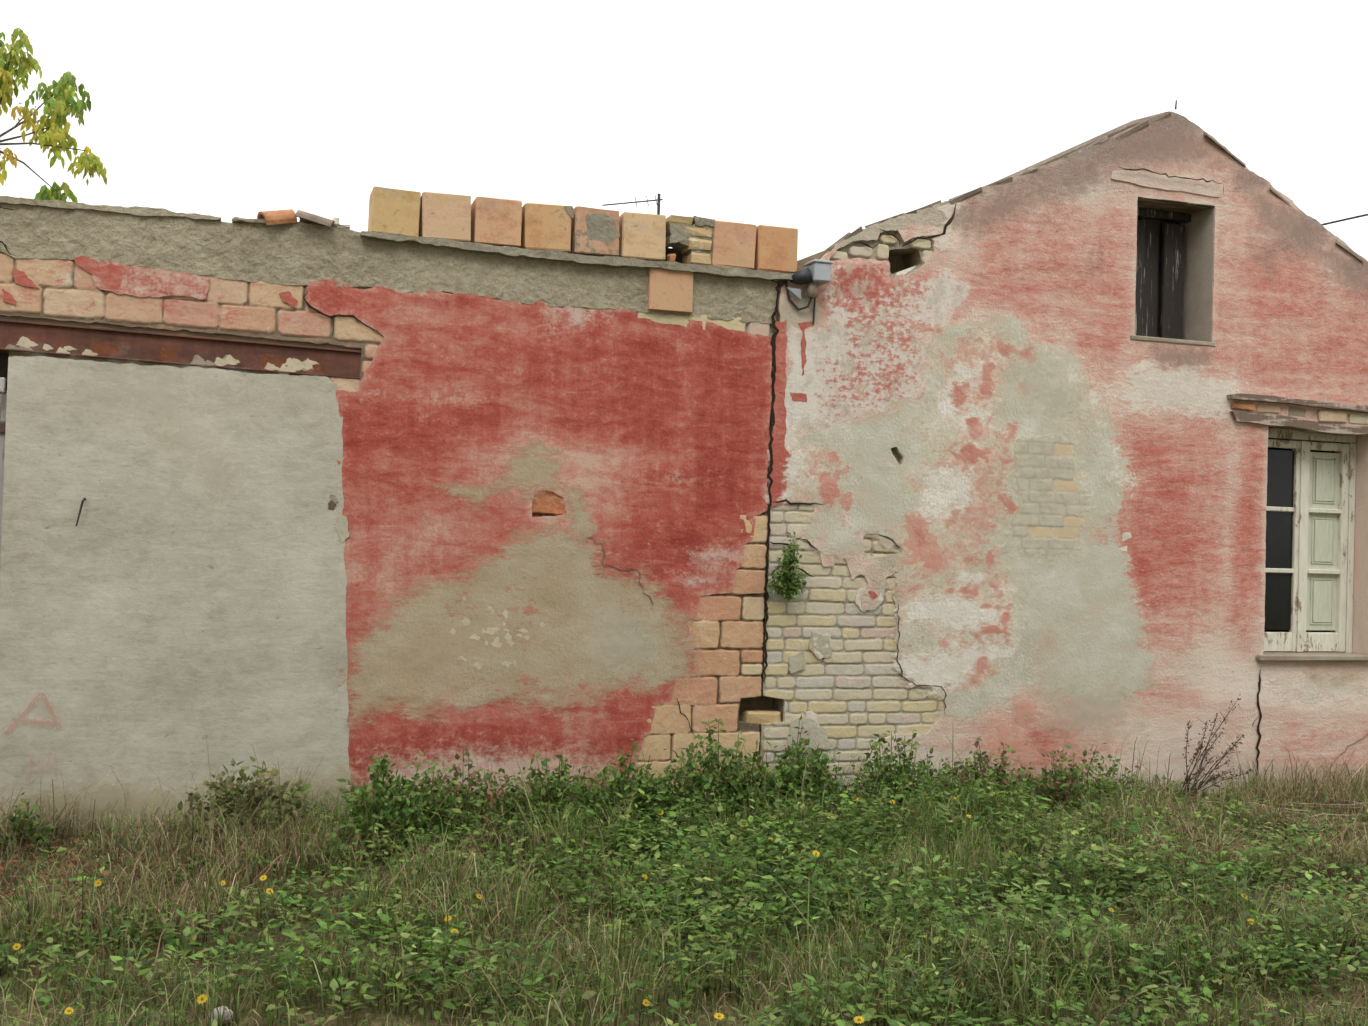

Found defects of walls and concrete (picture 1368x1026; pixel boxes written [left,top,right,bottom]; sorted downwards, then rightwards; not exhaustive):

crack [855,204,956,249]
spalling [0,252,384,392]
peeling [338,202,1247,810]
crack [583,536,653,609]
crack [1253,669,1262,782]
crack [1325,734,1368,778]